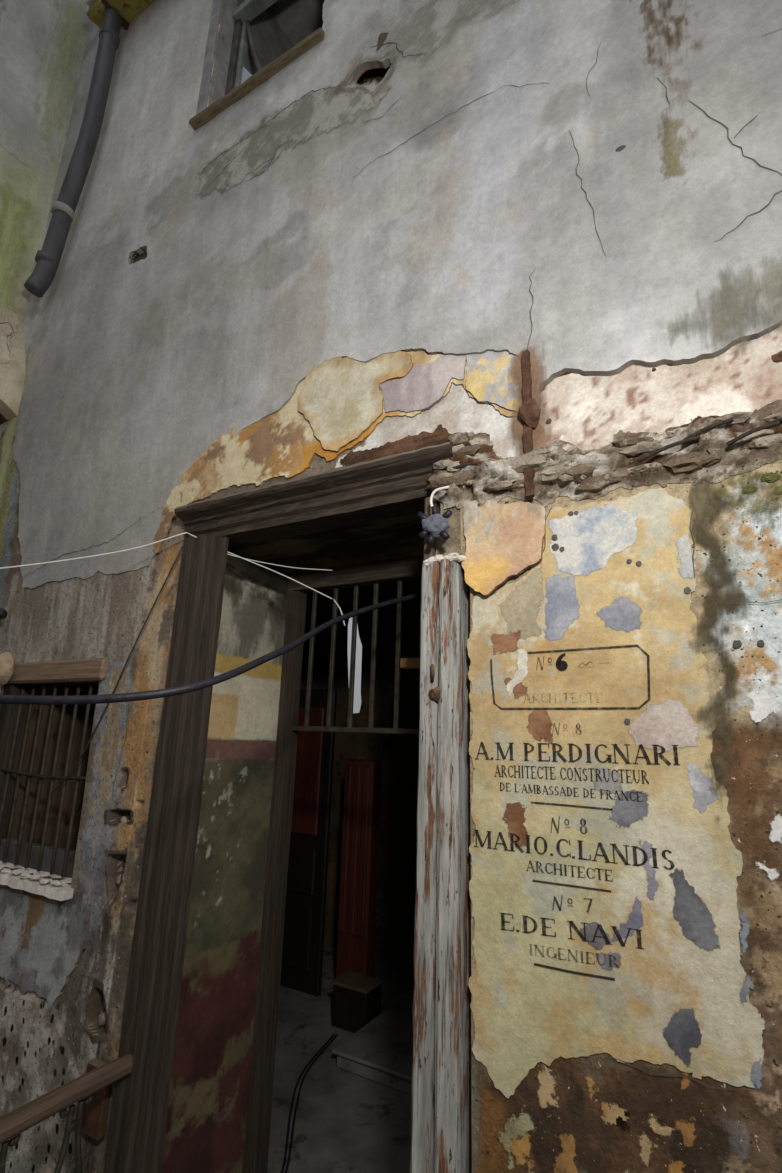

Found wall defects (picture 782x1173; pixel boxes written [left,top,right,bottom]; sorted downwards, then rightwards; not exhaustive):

spalling [196,0,514,196]
crack [569,131,606,256]
crack [657,77,782,242]
peeling [0,299,19,364]
peeling [153,351,521,554]
corrosion [511,348,552,498]
peeling [0,847,128,1006]
peeling [499,1066,559,1173]
peeling [554,1134,578,1173]
peeling [637,1114,696,1166]
peeling [668,1160,686,1173]
peeling [750,1060,763,1089]